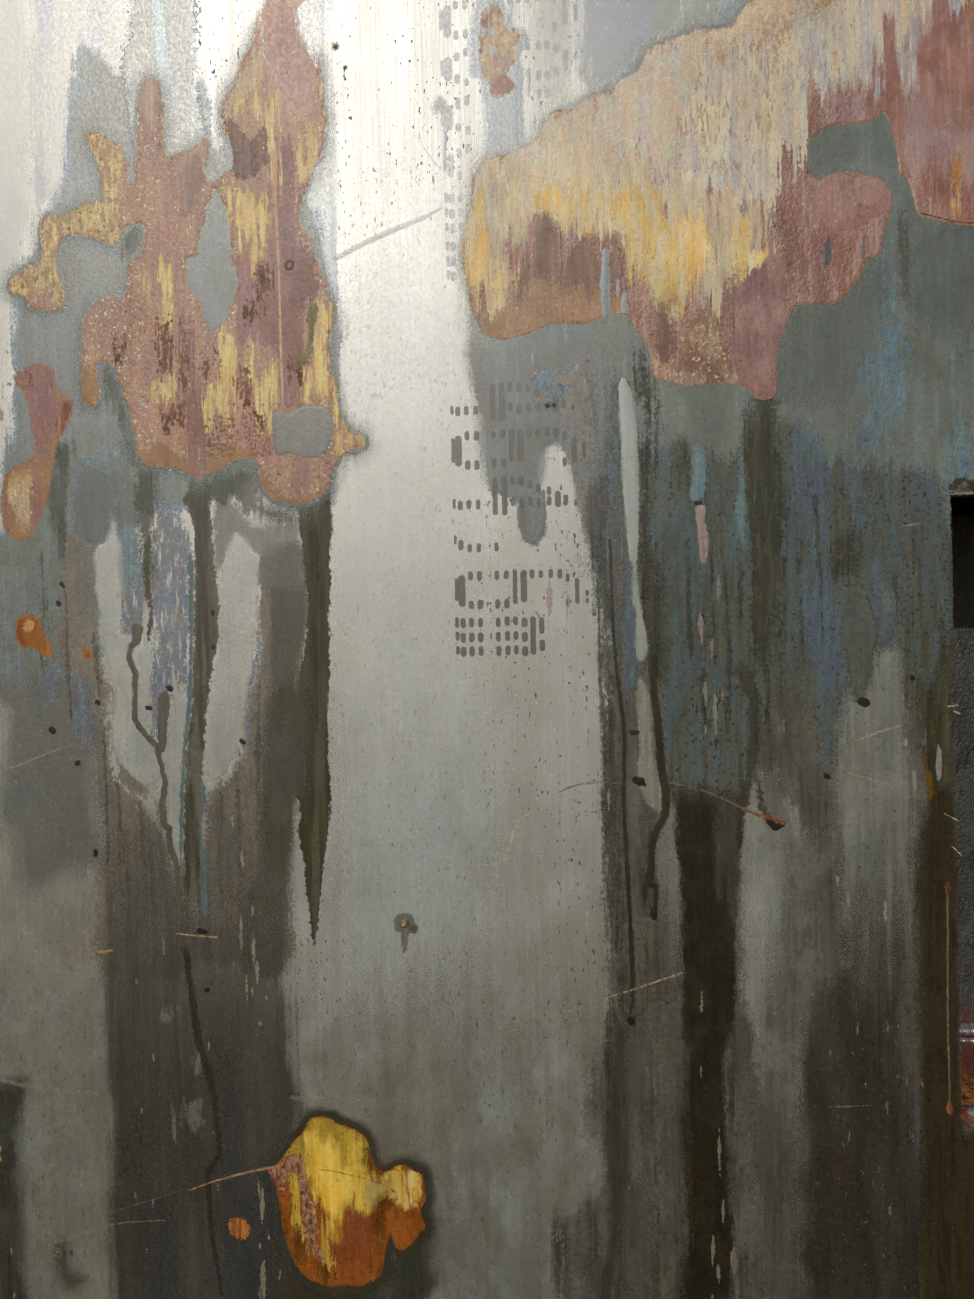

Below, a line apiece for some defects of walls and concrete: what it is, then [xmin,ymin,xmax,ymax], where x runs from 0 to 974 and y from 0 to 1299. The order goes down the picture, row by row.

corrosion [15,613,53,658]
leakage [733,807,746,849]
leakage [610,994,622,1026]
leakage [726,1050,738,1214]
corrosion [946,1101,970,1127]